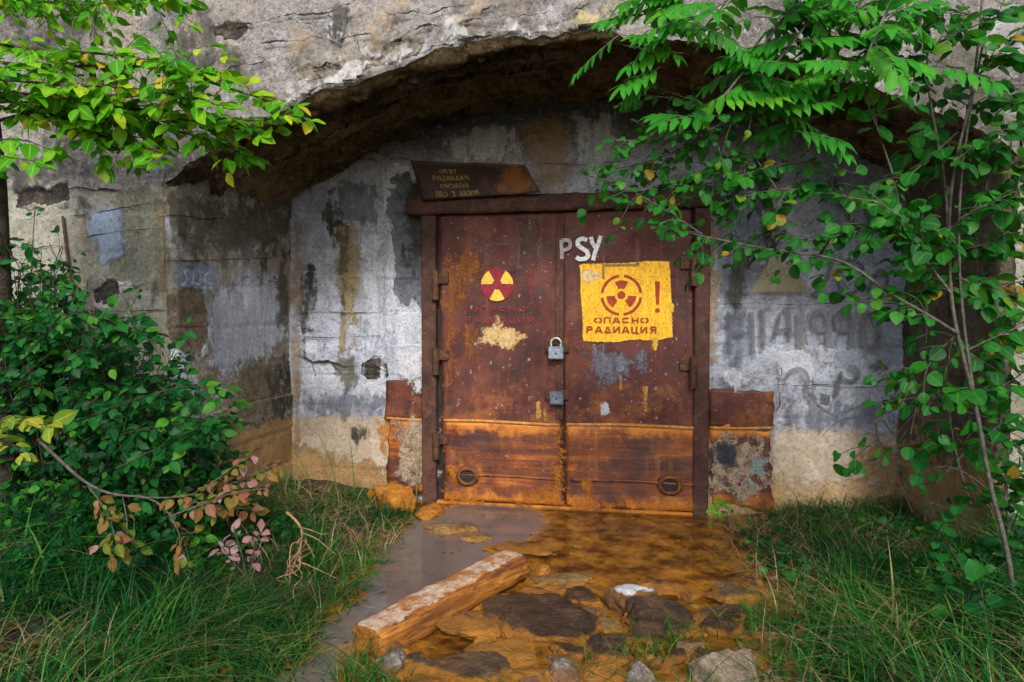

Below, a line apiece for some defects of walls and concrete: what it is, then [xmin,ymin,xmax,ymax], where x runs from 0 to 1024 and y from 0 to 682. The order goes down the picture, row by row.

spalling [293,36,425,94]
damp [174,180,422,498]
rust [440,248,489,387]
spalling [231,340,389,429]
rust [442,465,483,505]
rust [517,430,694,513]